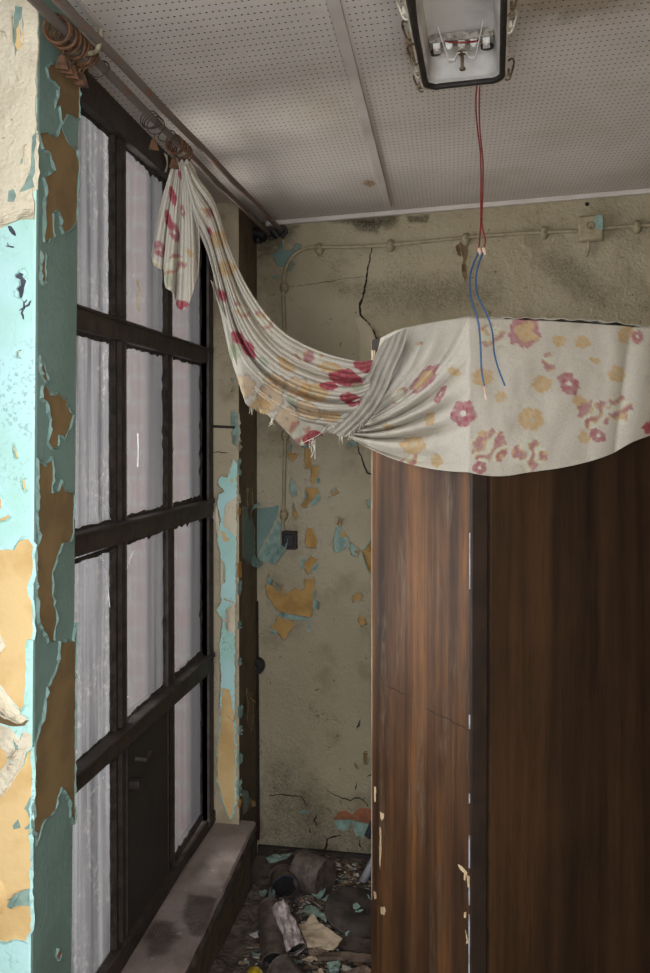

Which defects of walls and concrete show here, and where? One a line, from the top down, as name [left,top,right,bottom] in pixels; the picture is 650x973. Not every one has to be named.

peeling [0,0,82,301]
crack [289,248,377,339]
peeling [332,516,372,575]
peeling [0,355,79,945]
peeling [213,410,340,820]
crack [270,774,371,850]
peeling [331,806,371,838]